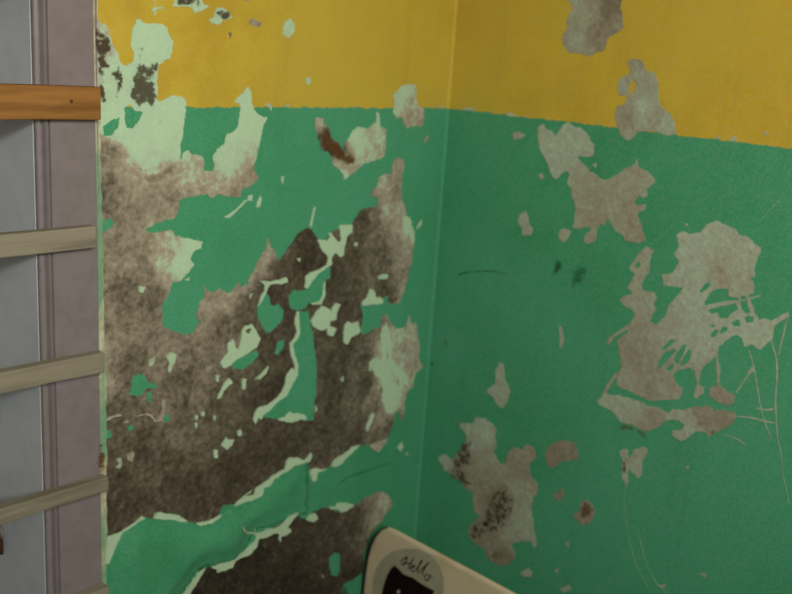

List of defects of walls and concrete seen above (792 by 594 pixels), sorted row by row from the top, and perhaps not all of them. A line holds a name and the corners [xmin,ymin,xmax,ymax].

spalling [173,0,232,24]
peeling [562,0,624,57]
peeling [615,58,677,140]
peeling [518,211,533,235]
peeling [96,19,424,564]
peeling [537,123,789,441]
peeling [487,362,510,408]
peeling [438,417,579,566]
peeling [183,492,392,594]